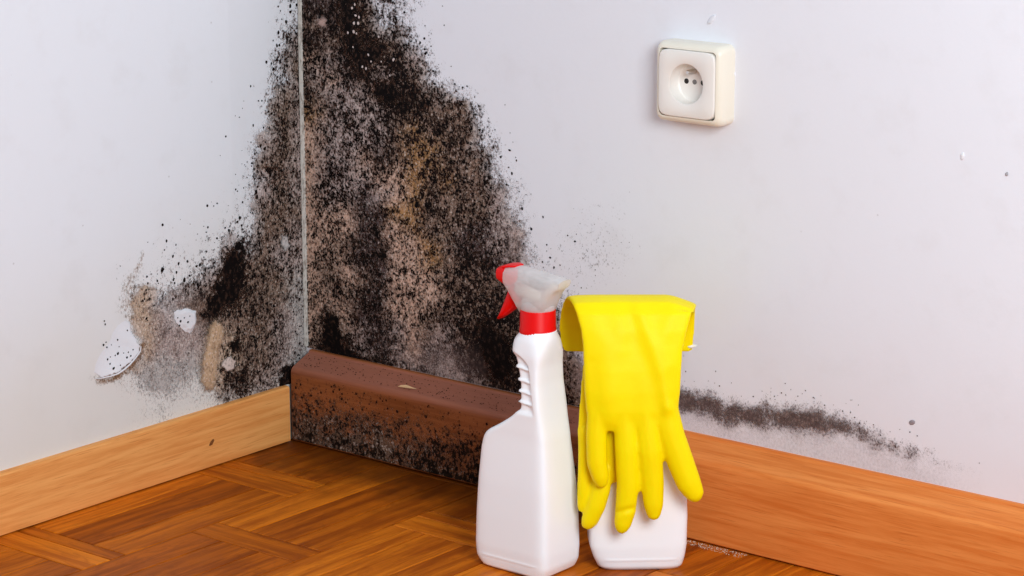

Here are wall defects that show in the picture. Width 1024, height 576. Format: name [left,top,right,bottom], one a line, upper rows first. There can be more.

damp [99,0,604,484]
peeling [93,320,141,379]
peeling [174,309,196,334]
damp [679,371,897,451]